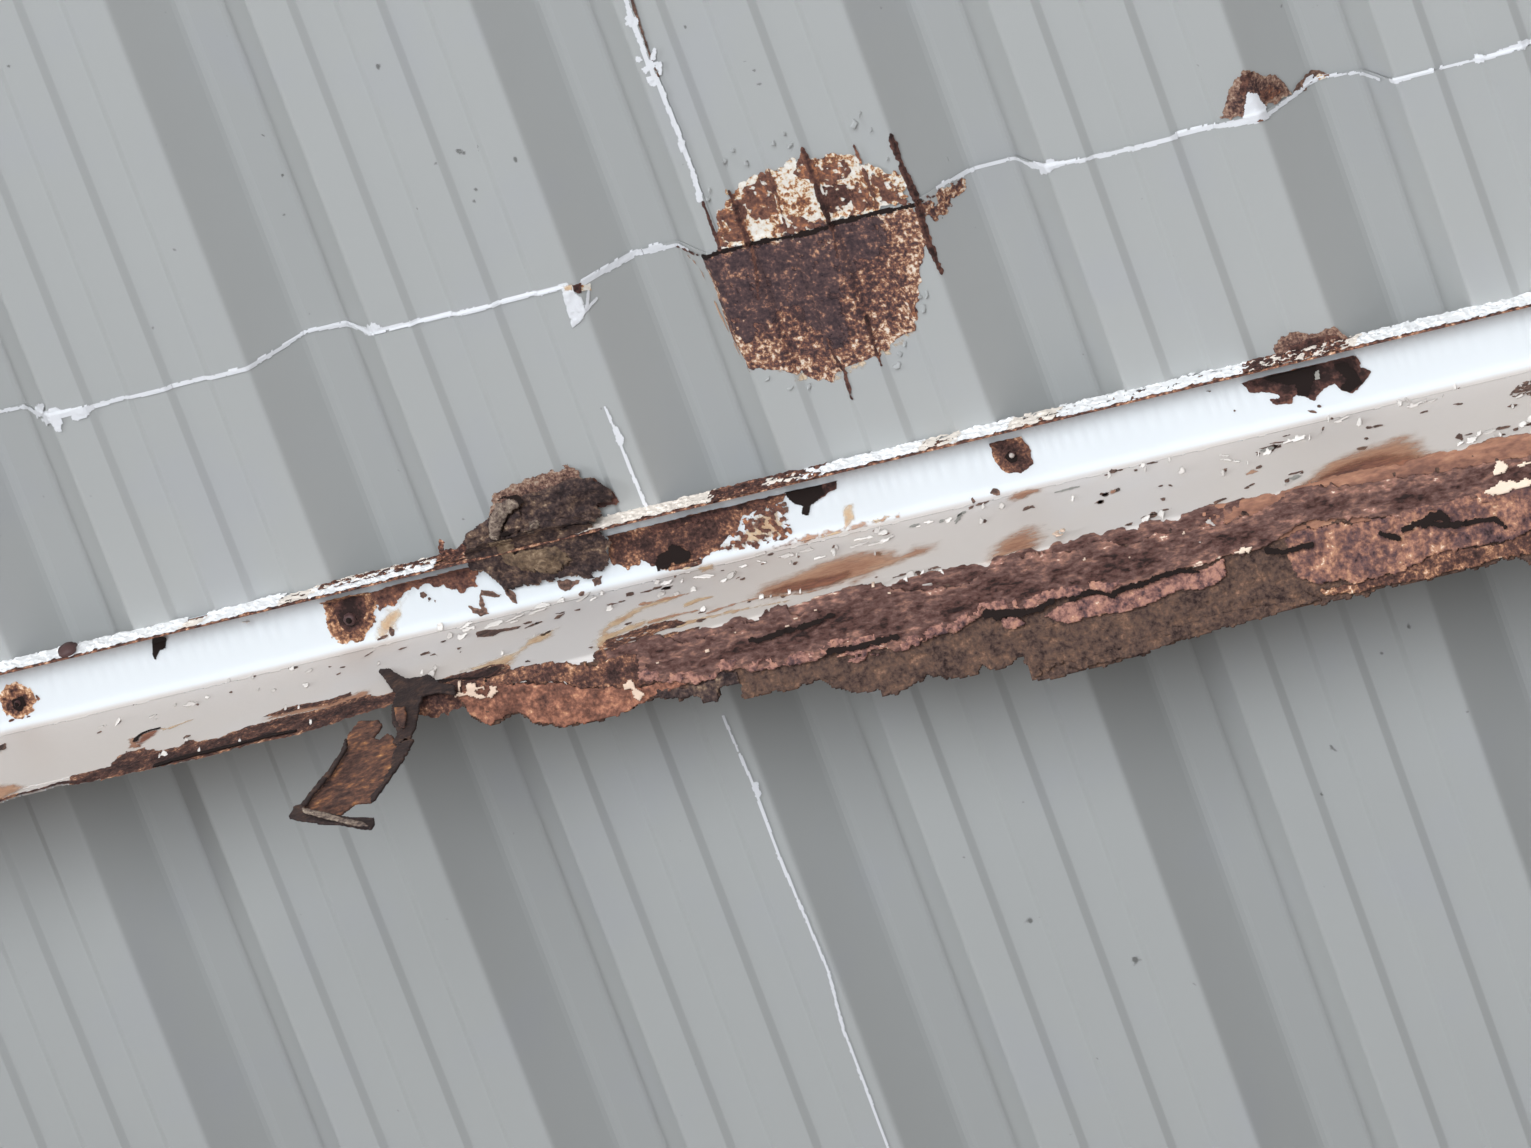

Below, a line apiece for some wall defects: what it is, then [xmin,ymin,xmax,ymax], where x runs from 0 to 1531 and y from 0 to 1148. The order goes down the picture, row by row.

crack [936,39,1531,190]
crack [0,0,720,432]
corrosion [676,133,966,400]
peeling [0,557,437,672]
crack [604,406,648,507]
peeling [437,488,1004,650]
corrosion [606,462,837,572]
corrosion [589,548,928,662]
corrosion [989,436,1034,473]
peeling [762,292,1531,489]
corrosion [1239,326,1371,405]
crack [722,715,889,1148]